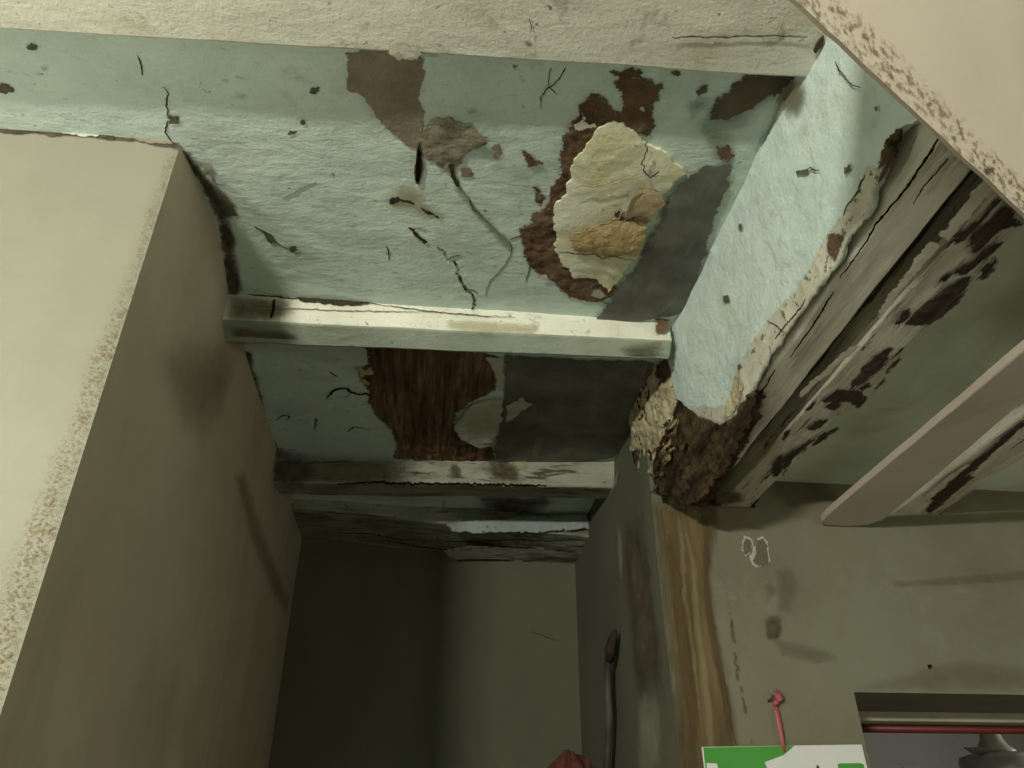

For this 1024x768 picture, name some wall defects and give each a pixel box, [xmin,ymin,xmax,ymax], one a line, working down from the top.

crack [137,55,174,143]
crack [229,163,530,318]
peeling [345,43,425,185]
crack [540,68,565,105]
flaking render [519,67,664,303]
peeling [716,142,735,164]
crack [672,23,806,39]
crack [691,138,949,424]
peeling [750,0,1024,514]
crack [276,372,373,429]
flaking render [454,357,505,449]
flaking render [624,318,678,471]